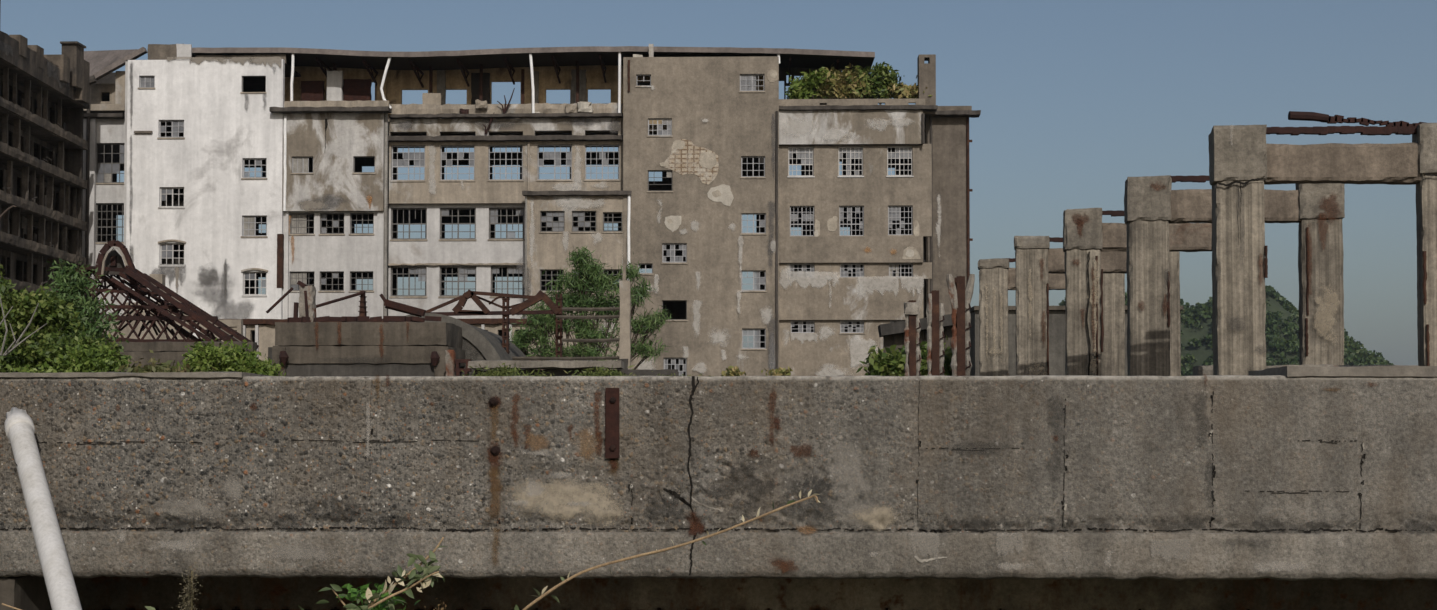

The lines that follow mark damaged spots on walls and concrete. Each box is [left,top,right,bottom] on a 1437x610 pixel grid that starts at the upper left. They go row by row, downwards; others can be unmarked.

damp [300,196,339,211]
spalling [660,139,734,206]
damp [152,261,253,319]
corrosion [488,395,545,516]
corrosion [568,391,618,472]
crack [0,252,1435,575]
corrosion [751,391,780,457]